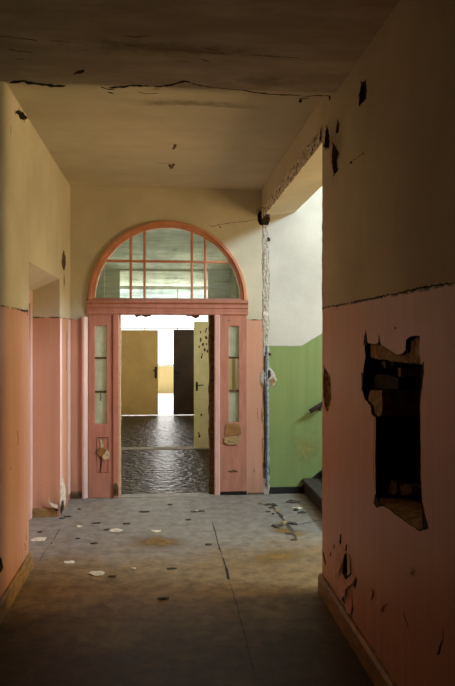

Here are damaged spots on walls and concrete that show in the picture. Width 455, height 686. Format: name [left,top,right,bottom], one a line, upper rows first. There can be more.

crack [10,79,65,87]
crack [101,80,331,103]
flaking render [358,79,367,106]
flaking render [260,122,339,494]
crack [325,282,453,307]
spalling [361,330,428,530]
crack [212,521,256,680]
peeling [322,534,357,615]